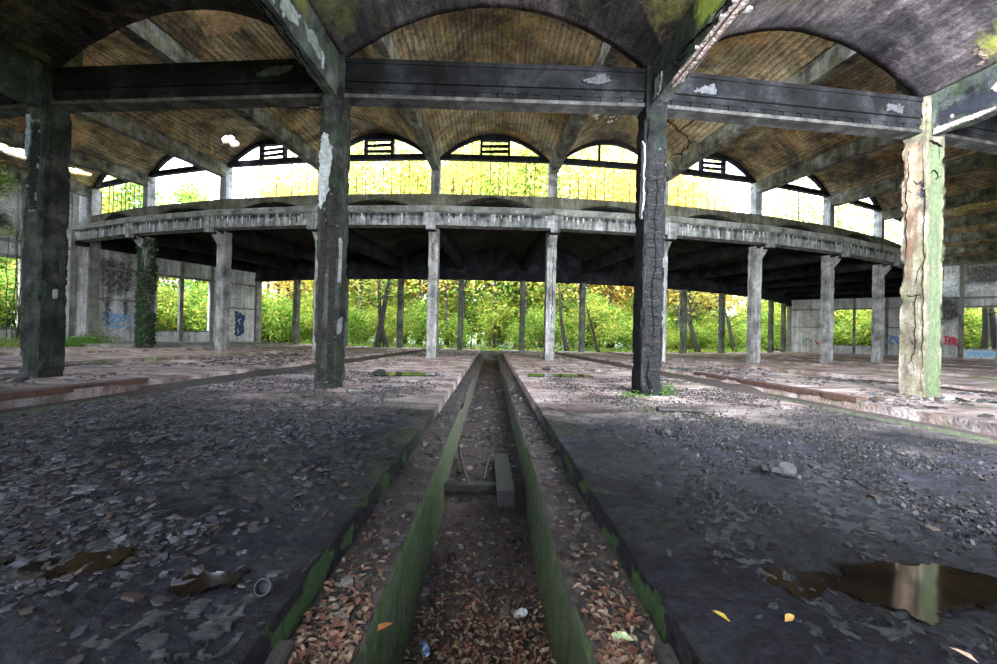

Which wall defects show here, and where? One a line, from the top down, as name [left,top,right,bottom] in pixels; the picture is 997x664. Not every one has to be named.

peeling [271,0,326,69]
damp [651,0,723,29]
damp [980,37,997,53]
flaking render [933,107,996,134]
spalling [24,114,41,213]
spalling [0,132,426,417]
crack [905,140,943,389]